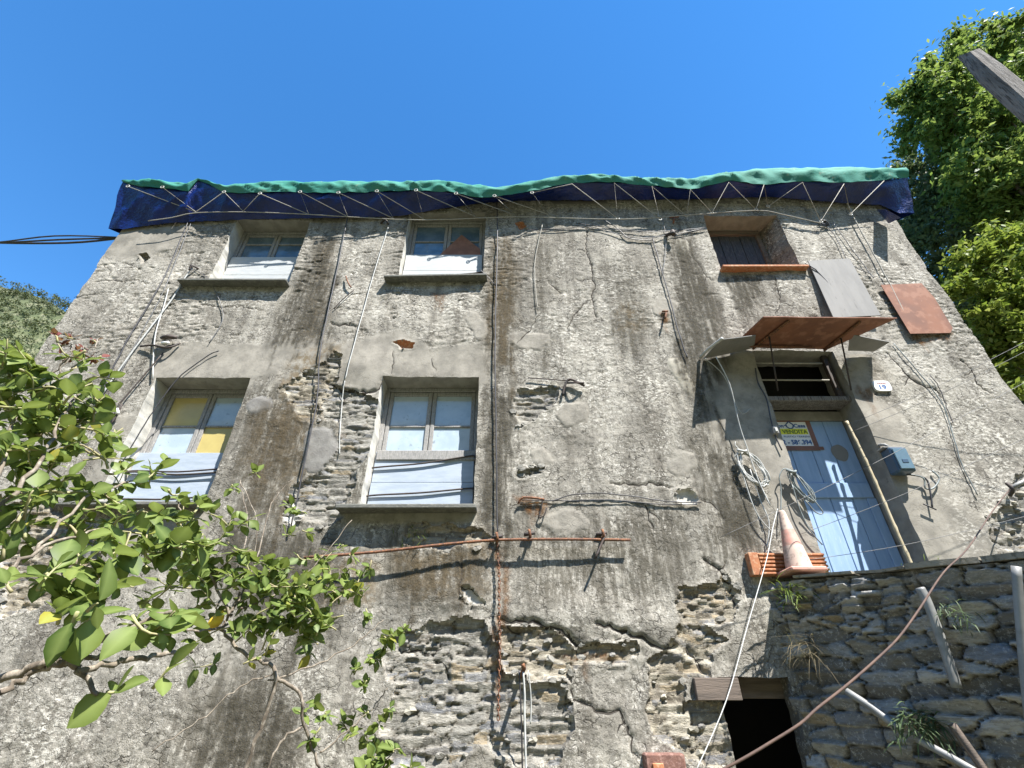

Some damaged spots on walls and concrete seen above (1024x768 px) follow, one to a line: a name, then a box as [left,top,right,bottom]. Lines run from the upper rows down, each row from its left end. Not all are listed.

leakage [245,408,300,516]
leakage [273,238,339,385]
spalling [278,350,379,530]
spalling [393,339,415,349]
leakage [482,390,513,556]
leakage [487,237,514,374]
spalling [509,385,560,428]
crack [550,234,597,331]
leakage [676,241,724,441]
spalling [378,573,742,768]